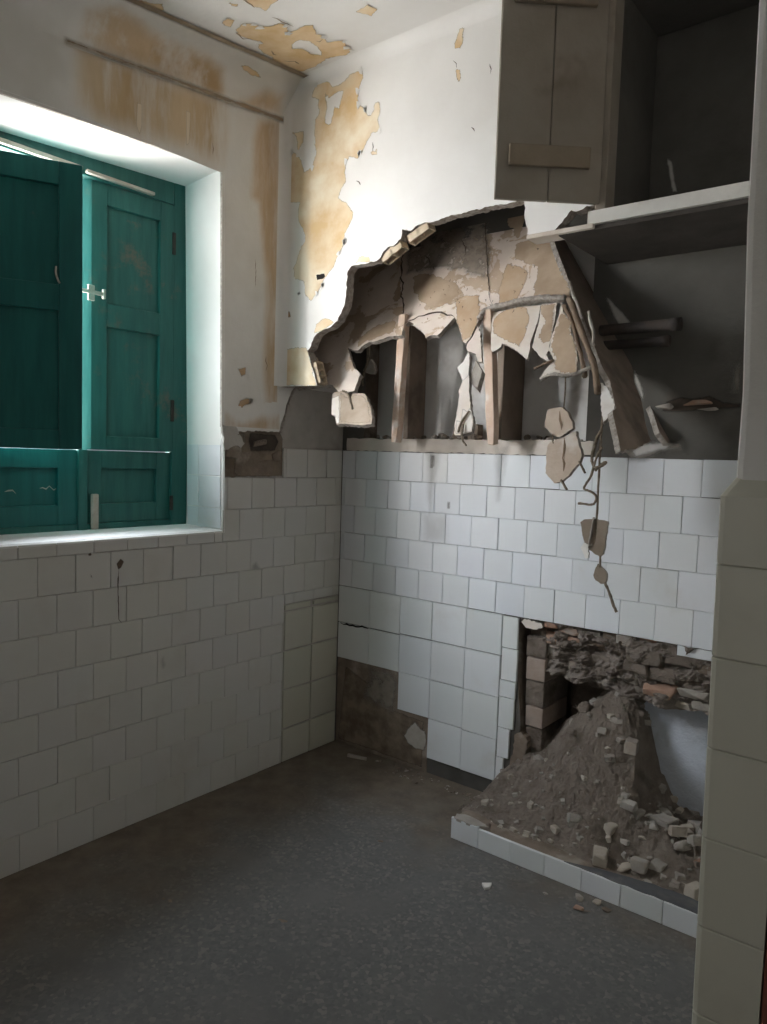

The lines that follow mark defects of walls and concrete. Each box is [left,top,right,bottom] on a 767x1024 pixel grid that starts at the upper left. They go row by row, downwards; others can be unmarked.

peeling [229,0,278,11]
peeling [222,19,354,72]
peeling [290,67,381,300]
leakage [42,0,300,430]
spalling [356,223,436,265]
spalling [430,265,567,321]
peeling [314,319,333,333]
flaking render [221,347,328,478]
peeling [336,657,428,772]